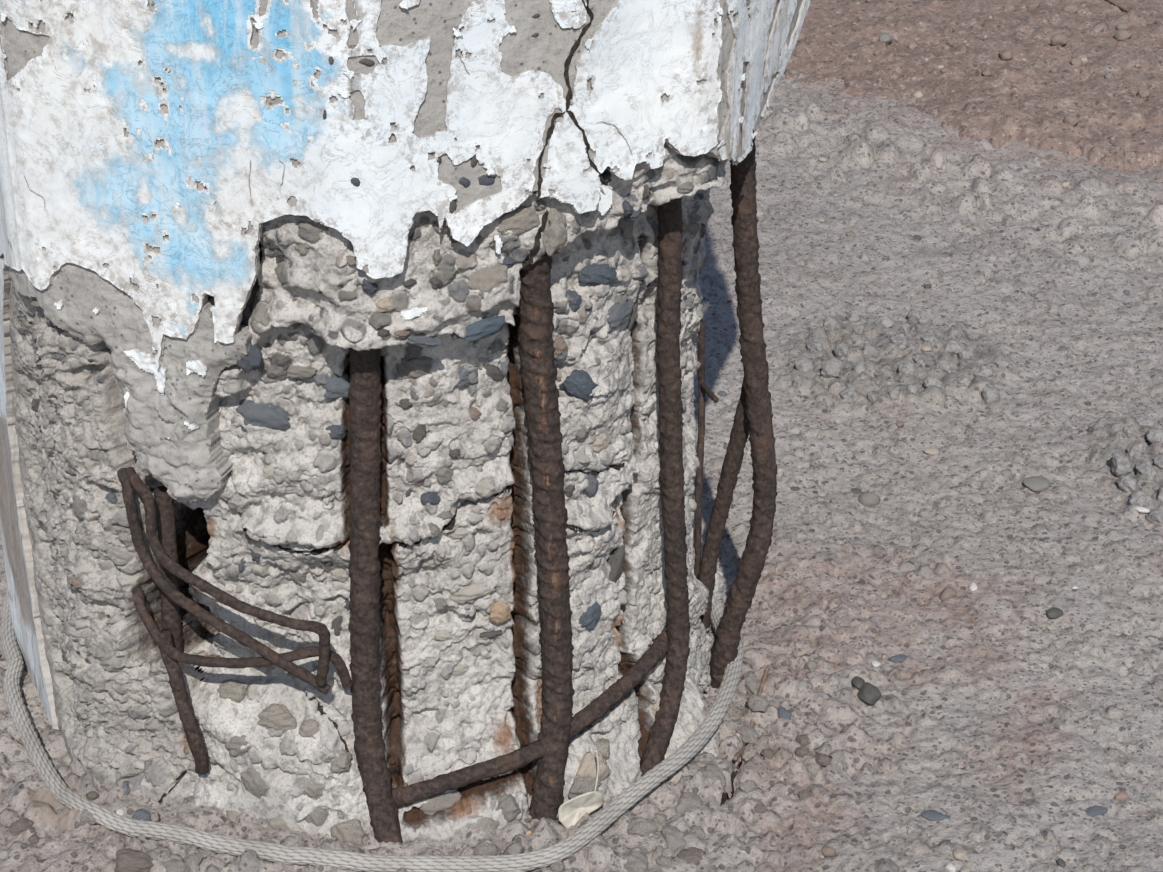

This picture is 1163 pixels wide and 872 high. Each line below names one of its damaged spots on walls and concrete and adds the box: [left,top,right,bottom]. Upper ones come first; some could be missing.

peeling [0,13,50,81]
peeling [786,0,803,46]
crack [522,0,632,270]
rust [176,507,217,648]
rust [341,398,351,543]
rust [379,356,389,527]
spalling [8,0,779,849]
rust [507,314,533,748]
rust [378,543,404,787]
rust [403,761,537,829]
rust [615,626,636,675]
rust [623,682,652,763]